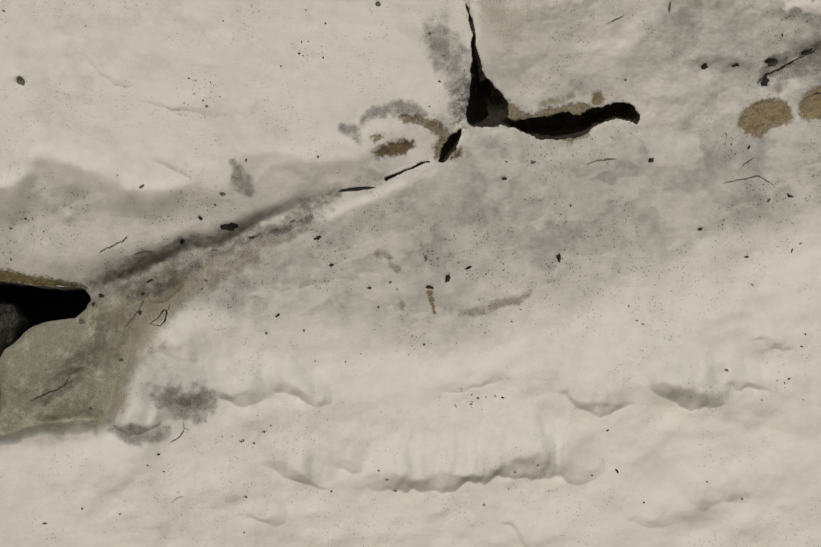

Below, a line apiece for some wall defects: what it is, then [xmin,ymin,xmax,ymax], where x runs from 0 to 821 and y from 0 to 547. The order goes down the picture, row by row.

crack [466,5,475,34]
spalling [738,86,821,149]
spalling [370,134,414,157]
spalling [399,114,462,163]
crack [384,161,430,181]
spalling [0,258,87,289]